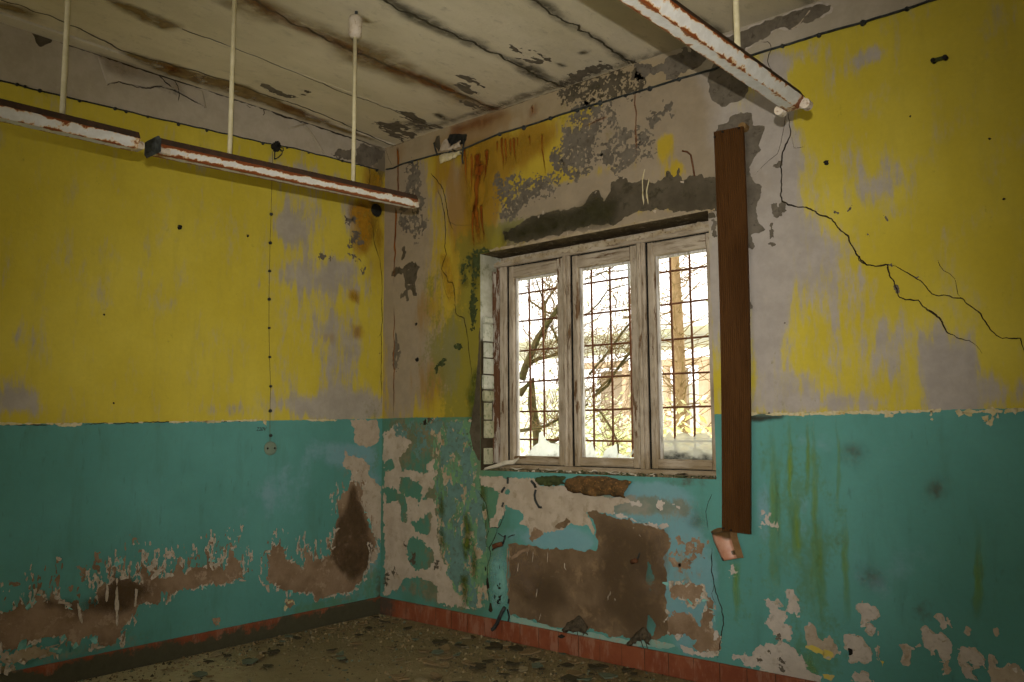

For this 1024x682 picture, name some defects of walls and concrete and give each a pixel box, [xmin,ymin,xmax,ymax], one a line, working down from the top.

spalling [726,2,833,51]
corrosion [464,135,545,240]
spalling [489,47,787,265]
crack [761,114,1024,353]
leakage [460,247,490,332]
leakage [334,488,372,578]
spalling [0,328,722,676]
leakage [90,580,145,611]
peeling [732,589,884,682]
peeling [899,613,1024,682]